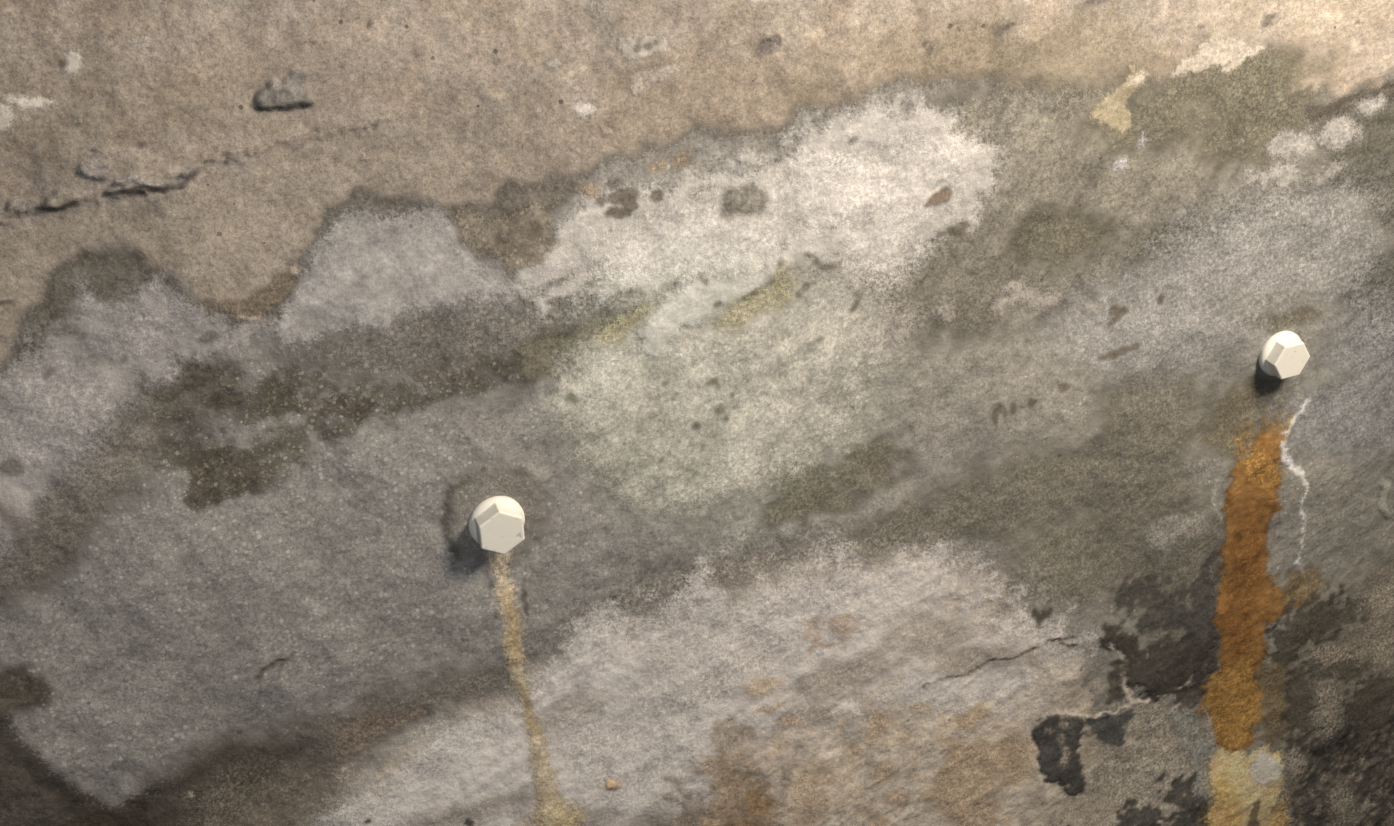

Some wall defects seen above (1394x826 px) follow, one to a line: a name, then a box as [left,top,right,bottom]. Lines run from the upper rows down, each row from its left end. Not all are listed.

rust [1196,410,1327,826]
rust [486,551,583,826]
water stain [1297,749,1313,777]
water stain [1357,756,1383,774]
water stain [1329,770,1394,826]